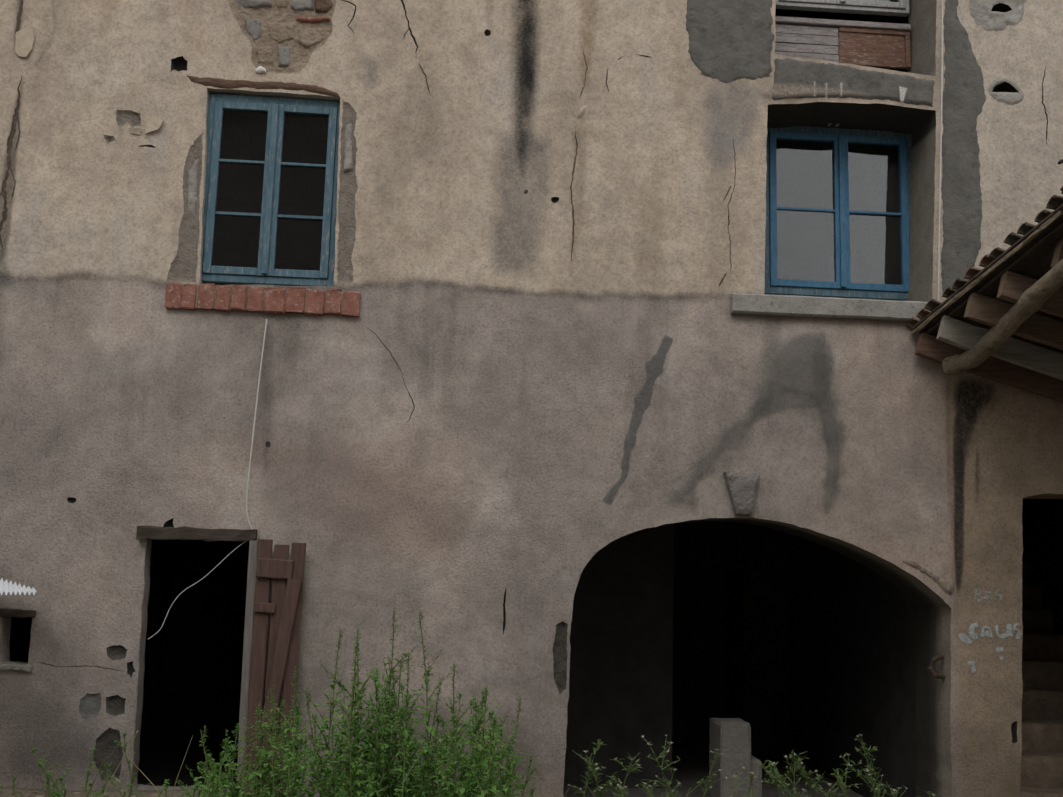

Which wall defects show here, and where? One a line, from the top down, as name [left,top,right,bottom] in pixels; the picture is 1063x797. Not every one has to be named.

spalling [228,0,336,74]
crack [401,0,430,92]
leakage [516,0,535,155]
crack [579,52,649,98]
spalling [969,0,1026,31]
crack [0,0,34,254]
spalling [103,110,163,144]
crack [570,127,578,260]
spalling [106,645,136,677]
spalling [79,693,126,781]